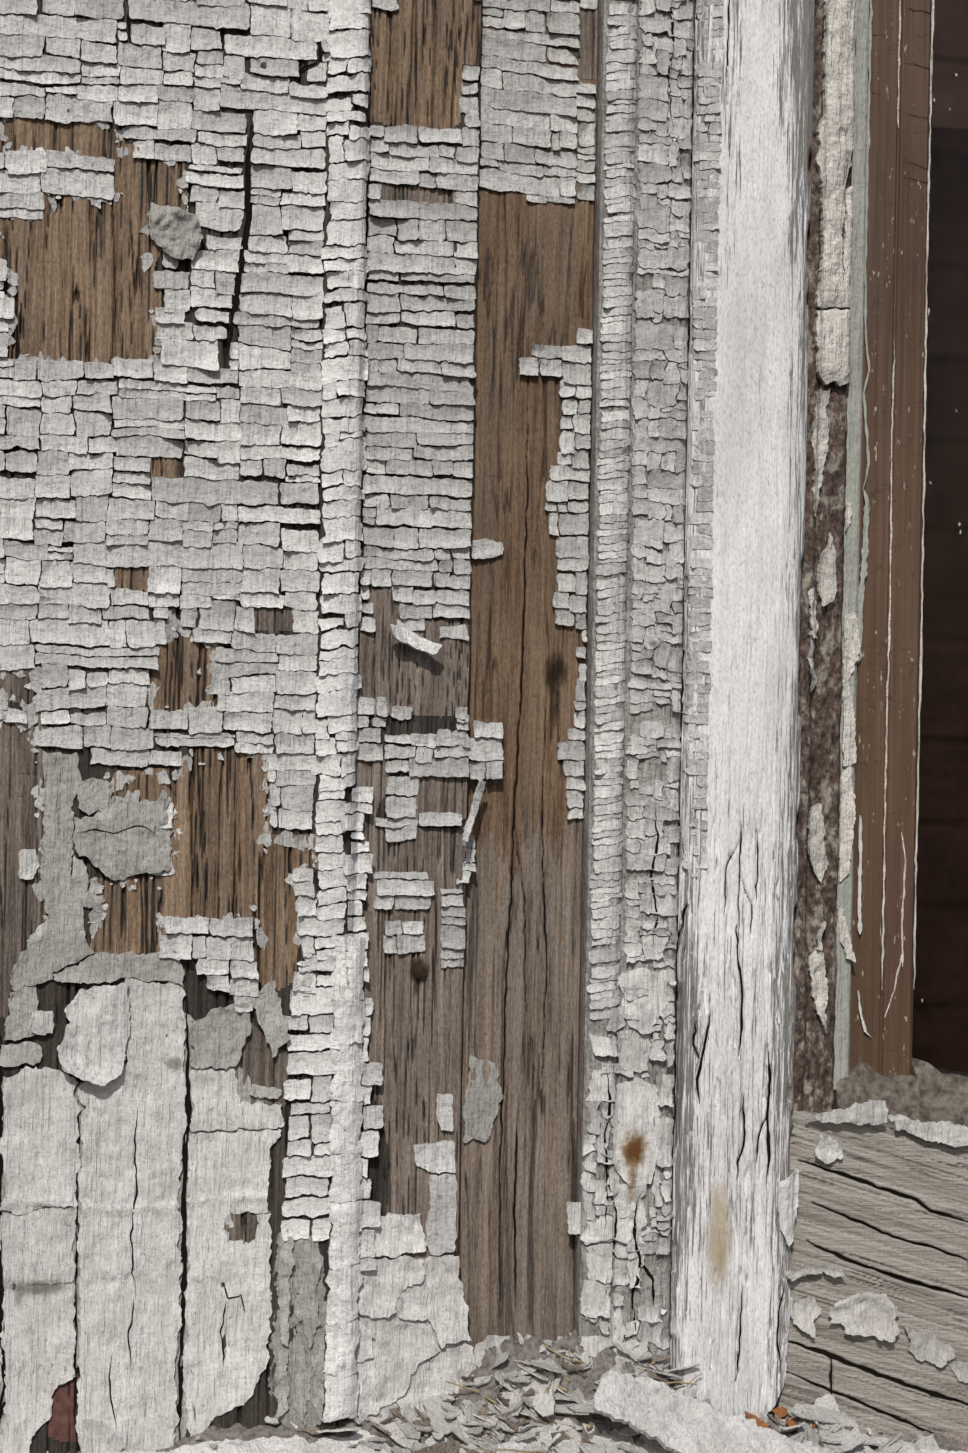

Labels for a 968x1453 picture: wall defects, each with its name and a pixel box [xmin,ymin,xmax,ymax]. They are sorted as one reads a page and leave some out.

crack [226,124,252,355]
peeling [0,0,724,1453]
crack [604,0,968,1364]
crack [0,1035,8,1425]
crack [73,1080,138,1451]
corrosion [622,1135,644,1193]
crack [735,1290,743,1380]
crack [776,1283,968,1433]
peeling [785,1262,968,1383]
peeling [806,1100,968,1164]